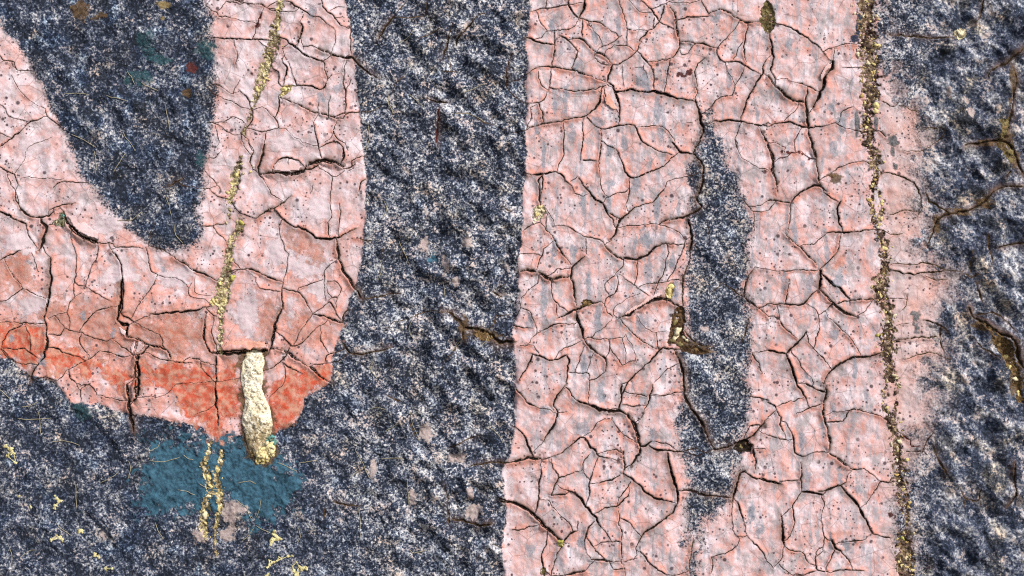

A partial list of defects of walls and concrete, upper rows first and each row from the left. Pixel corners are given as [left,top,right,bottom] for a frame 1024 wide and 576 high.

spalling [953,28,966,40]
peeling [52,212,98,239]
crack [0,0,409,432]
crack [379,0,1024,576]
spalling [986,326,1024,404]
spalling [203,443,223,506]
spalling [733,439,753,452]